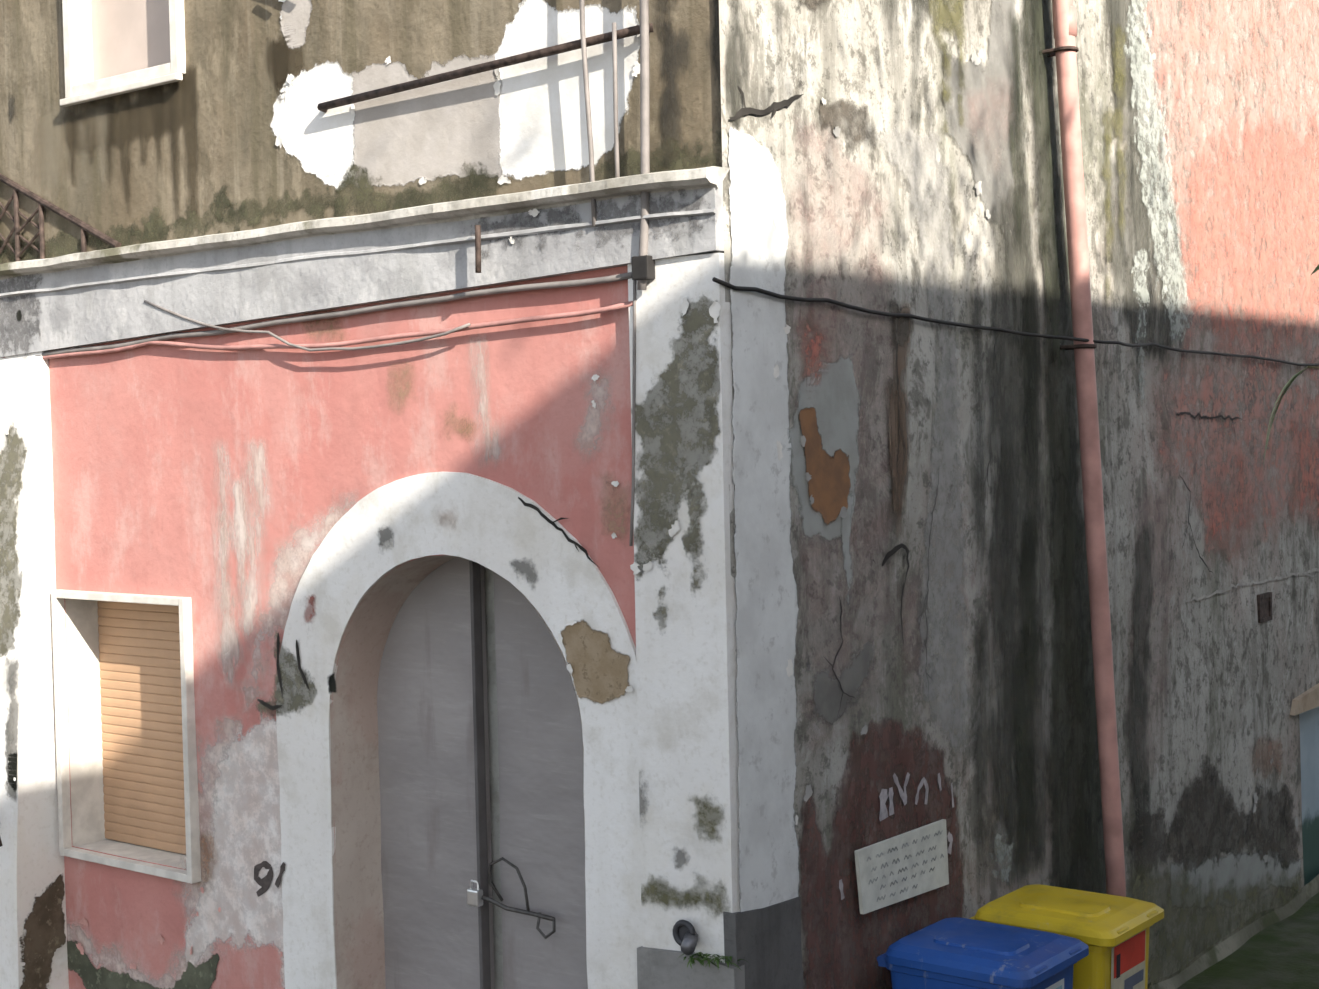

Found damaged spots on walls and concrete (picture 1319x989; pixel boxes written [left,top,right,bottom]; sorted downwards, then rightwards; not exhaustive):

peeling [270,0,640,189]
leakage [883,0,897,27]
leakage [913,0,931,55]
leakage [943,27,965,131]
leakage [1103,0,1193,404]
spalling [8,753,17,791]
peeling [20,719,285,989]
peeling [217,445,353,705]
spalling [558,620,633,704]
peeling [709,128,860,912]
leakage [974,0,1106,894]
leakage [1128,528,1301,909]